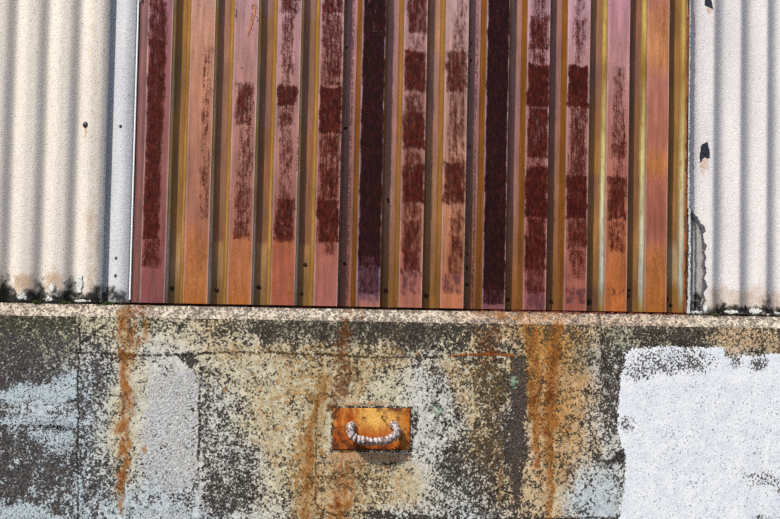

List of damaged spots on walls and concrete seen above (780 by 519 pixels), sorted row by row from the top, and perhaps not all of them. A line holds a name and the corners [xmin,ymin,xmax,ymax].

leakage [0,276,126,305]
corrosion [142,0,168,267]
corrosion [273,0,299,242]
corrosion [315,0,344,254]
corrosion [358,0,387,300]
corrosion [400,0,427,294]
corrosion [483,0,510,305]
corrosion [523,0,550,310]
corrosion [565,0,589,278]
peeling [616,328,780,519]
peeling [687,0,710,314]
leakage [691,293,780,317]